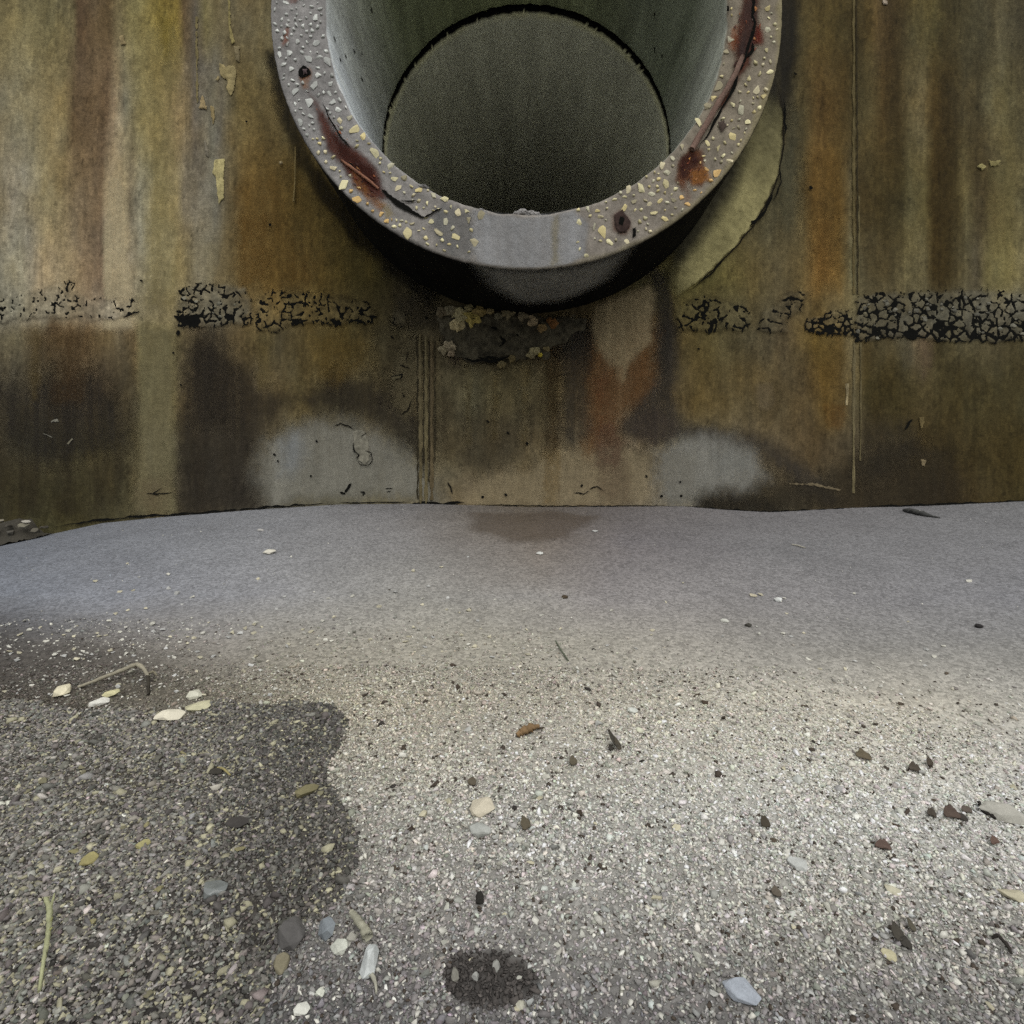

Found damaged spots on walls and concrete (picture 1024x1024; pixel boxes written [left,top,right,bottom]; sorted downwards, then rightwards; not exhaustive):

corrosion [720,0,761,106]
corrosion [316,108,384,199]
water stain [269,53,587,369]
corrosion [678,150,706,186]
crack [681,85,787,295]
spalling [0,280,139,323]
spalling [174,283,377,336]
spalling [675,287,1024,344]